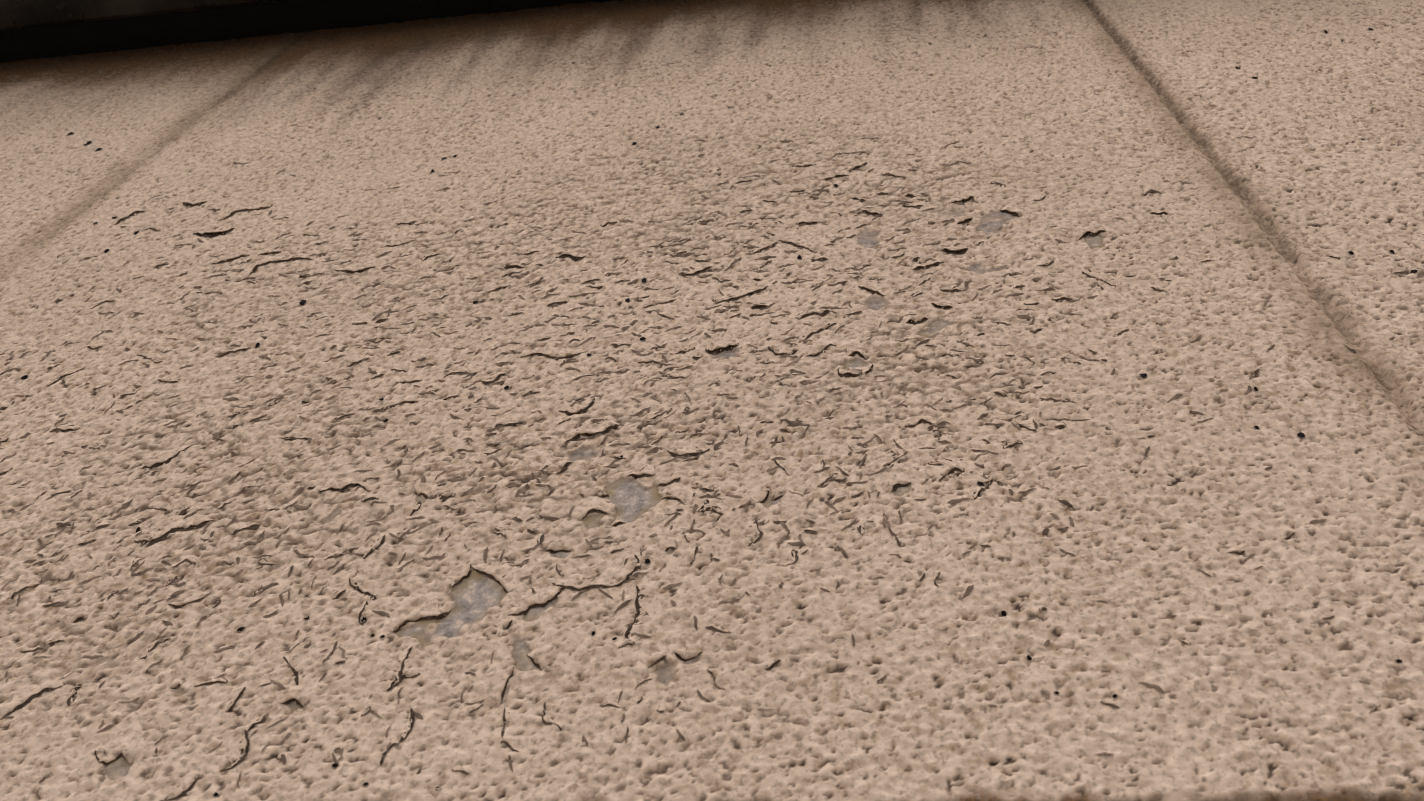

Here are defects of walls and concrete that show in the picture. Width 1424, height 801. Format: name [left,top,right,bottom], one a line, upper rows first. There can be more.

crack [1137,344,1274,459]
peeling [545,536,573,558]
crack [0,123,1212,801]
peeling [571,463,699,528]
peeling [385,558,564,708]